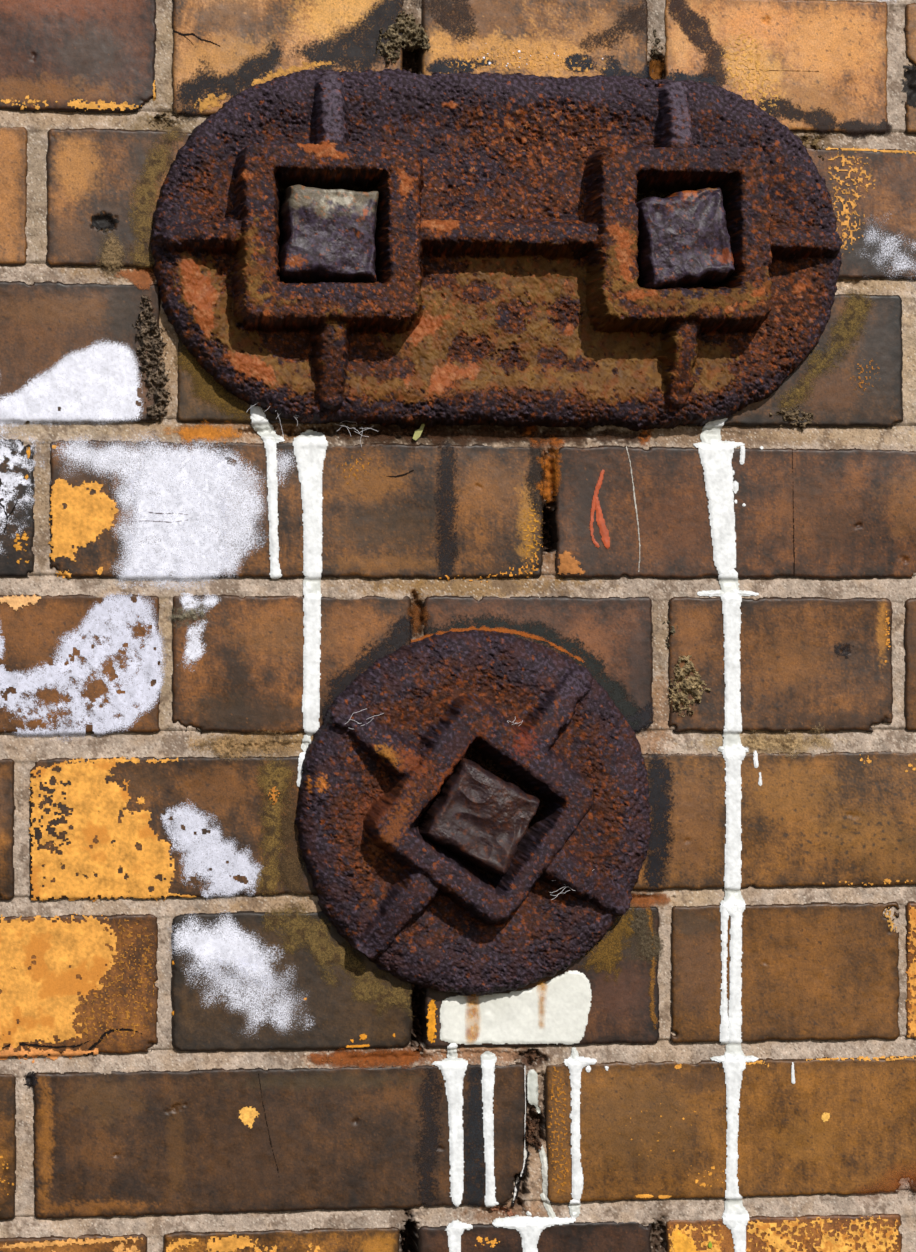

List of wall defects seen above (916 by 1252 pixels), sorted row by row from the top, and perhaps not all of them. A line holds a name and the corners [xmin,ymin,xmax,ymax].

rust [408,596,584,663]
peeling [29,756,196,902]